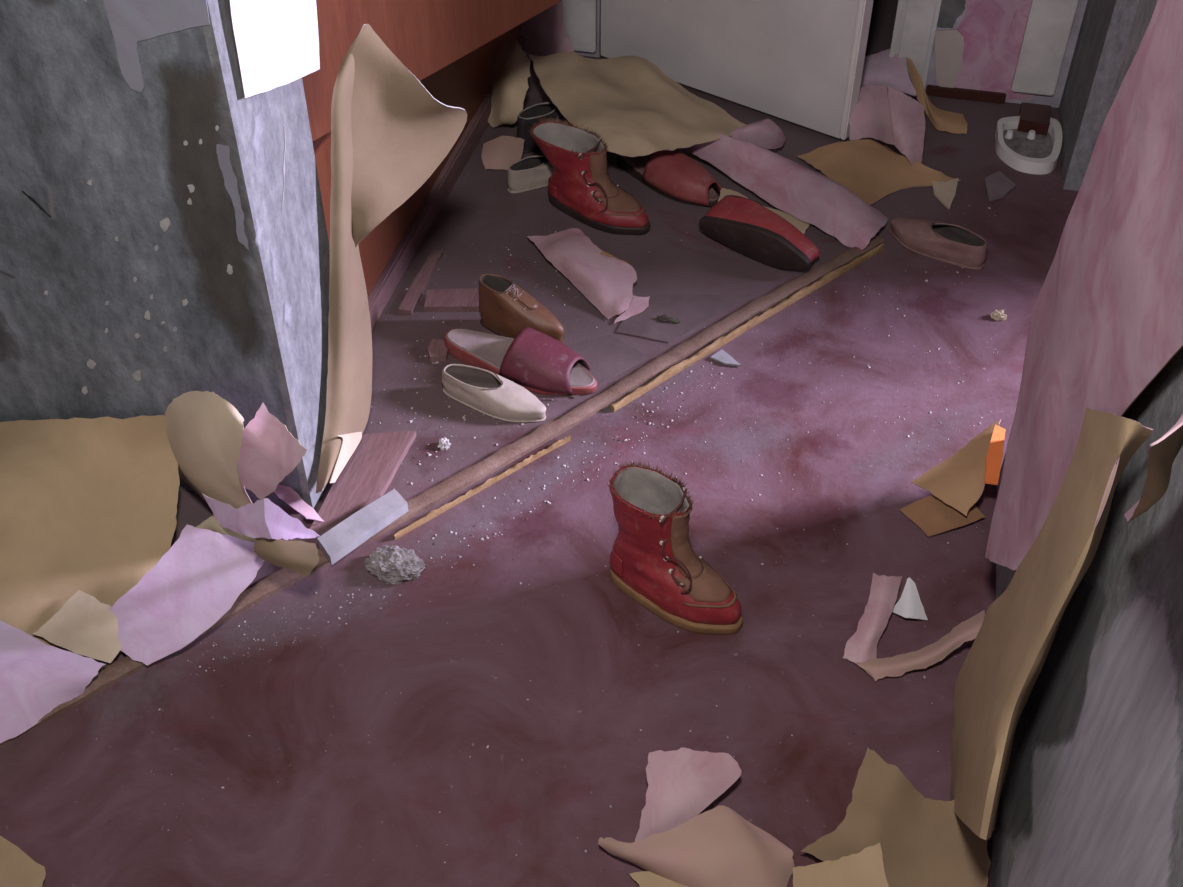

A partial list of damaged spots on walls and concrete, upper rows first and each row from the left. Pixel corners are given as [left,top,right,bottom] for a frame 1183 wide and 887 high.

flaking render [937,0,966,28]